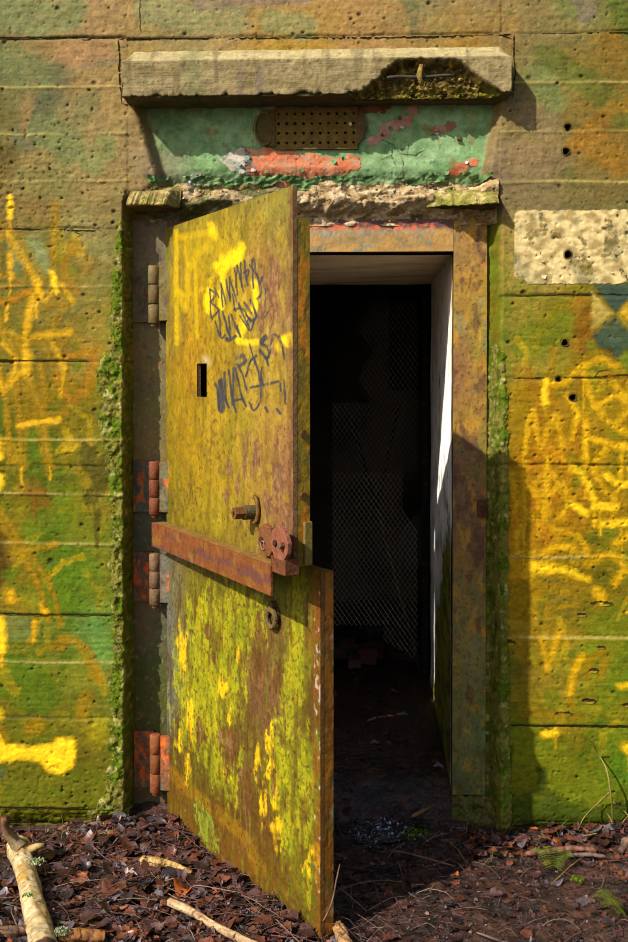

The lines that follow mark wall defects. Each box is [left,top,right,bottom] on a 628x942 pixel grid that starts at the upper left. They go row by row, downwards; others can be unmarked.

spalling [310,58,501,147]
spalling [143,147,499,226]